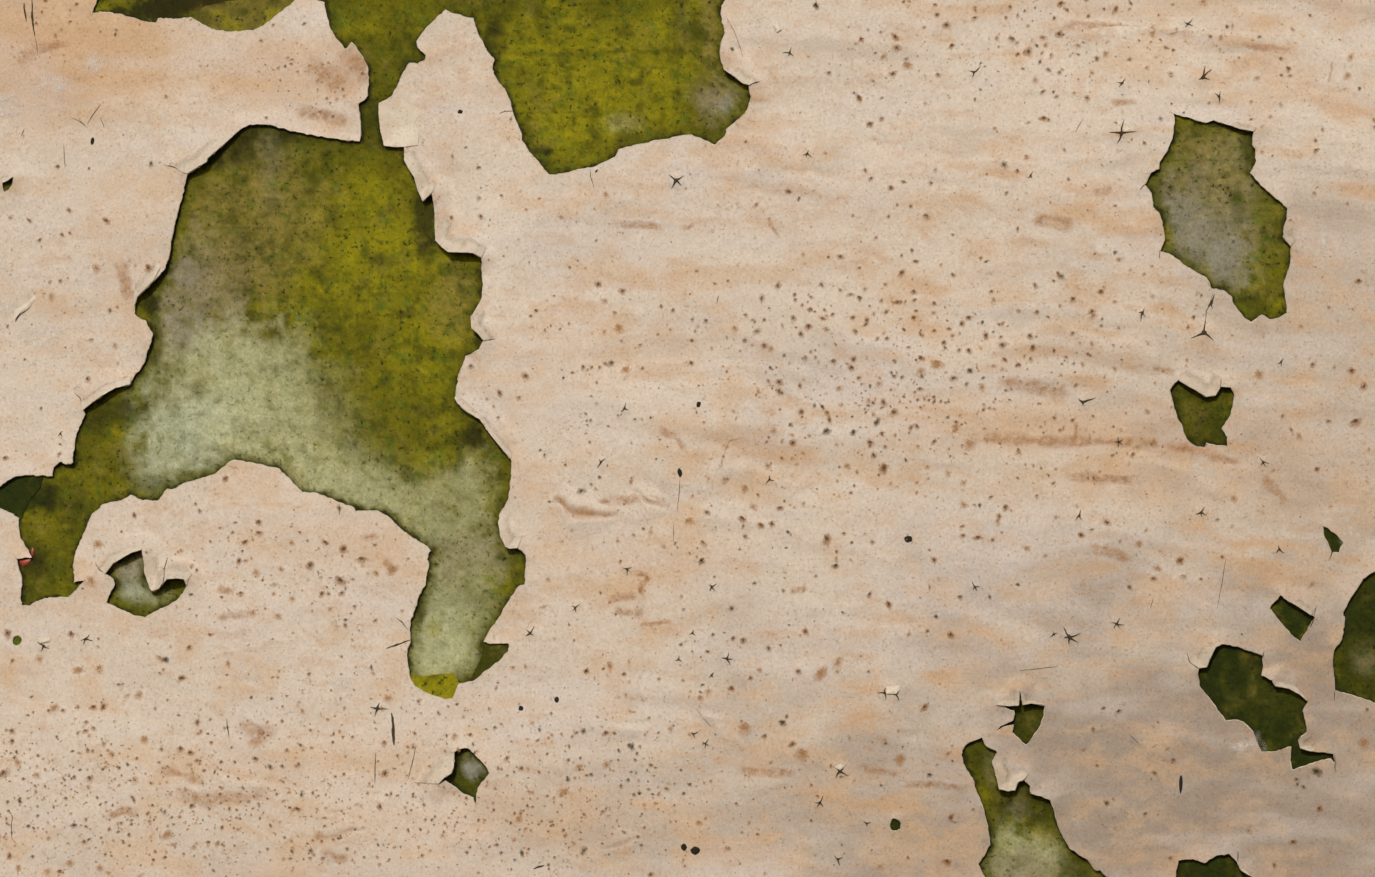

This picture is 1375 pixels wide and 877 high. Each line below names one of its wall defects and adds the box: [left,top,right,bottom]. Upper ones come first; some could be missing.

peeling [1144,113,1295,323]
peeling [0,0,756,700]
peeling [1170,372,1234,448]
peeling [1270,595,1314,641]
peeling [1333,571,1375,703]
peeling [1190,644,1335,770]
peeling [424,748,490,804]
peeling [961,688,1107,877]
peeling [1175,854,1255,877]